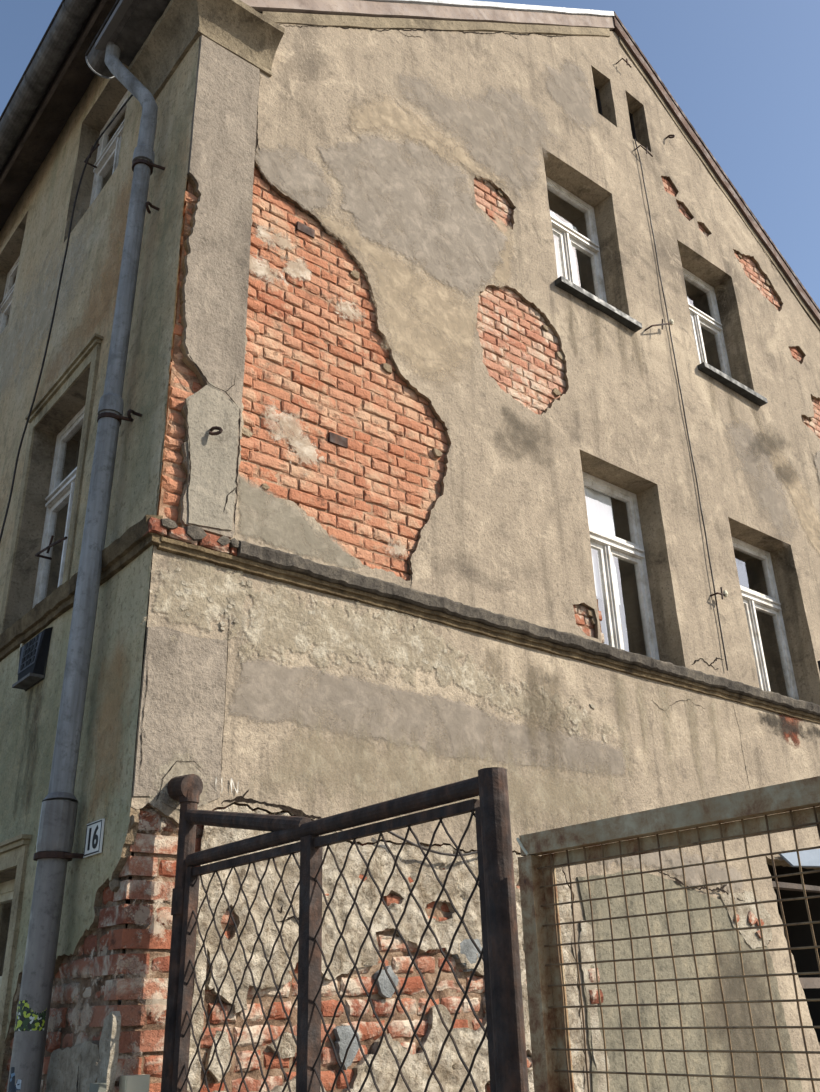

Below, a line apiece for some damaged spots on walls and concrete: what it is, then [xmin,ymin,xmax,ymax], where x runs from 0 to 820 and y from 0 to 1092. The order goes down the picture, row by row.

peeling [351,97,516,230]
flaking render [661,176,712,237]
flaking render [733,249,783,311]
peeling [143,160,617,743]
flaking render [788,346,806,364]
flaking render [801,394,820,438]
crack [139,615,343,831]
rust [780,714,801,746]
flaking render [40,785,179,1092]
crack [658,860,744,901]
flaking render [193,961,298,1092]
flaking render [321,929,485,1092]